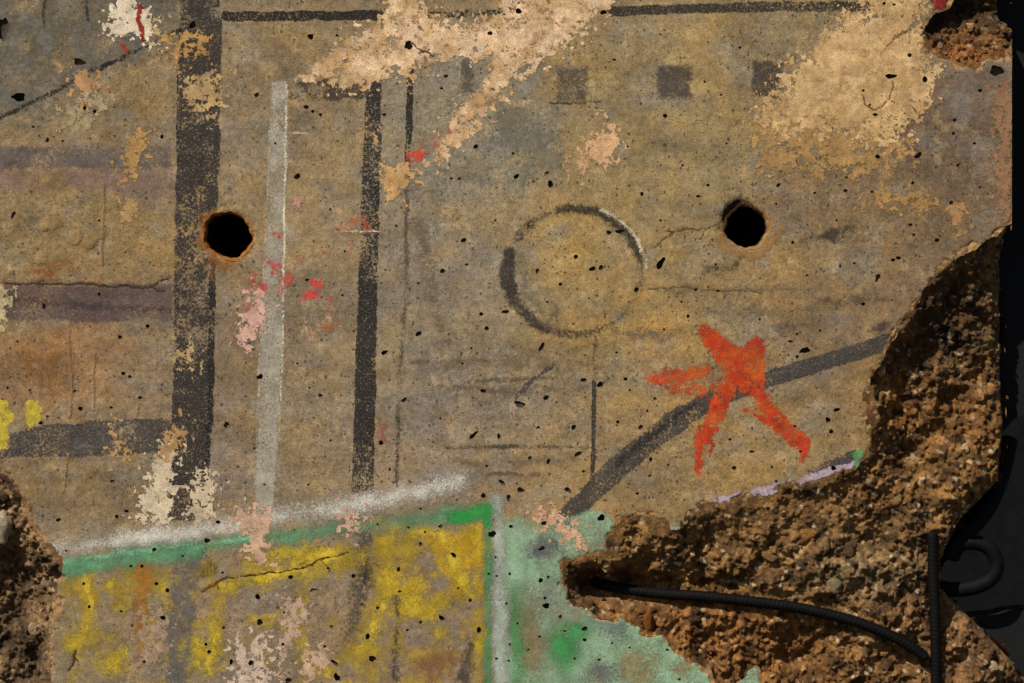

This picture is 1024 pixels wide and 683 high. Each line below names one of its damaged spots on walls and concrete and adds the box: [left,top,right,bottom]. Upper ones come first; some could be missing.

peeling [294,0,616,218]
spalling [498,0,1024,683]
spalling [0,470,67,683]
crack [201,551,348,593]